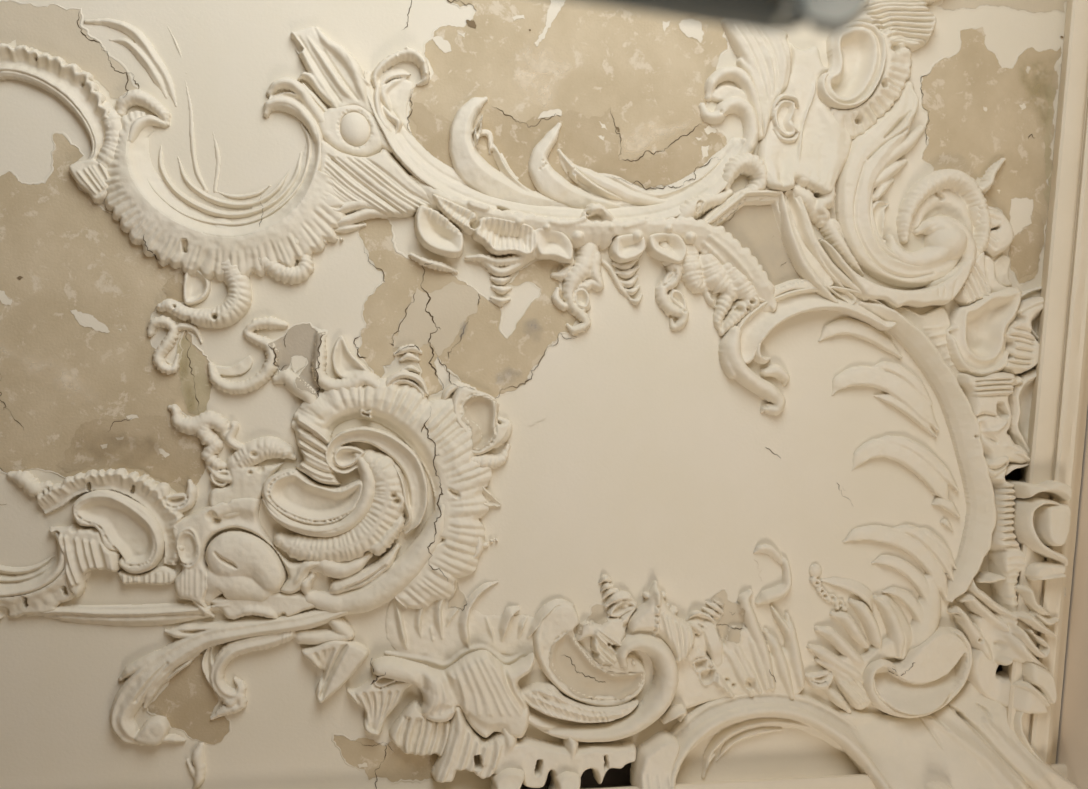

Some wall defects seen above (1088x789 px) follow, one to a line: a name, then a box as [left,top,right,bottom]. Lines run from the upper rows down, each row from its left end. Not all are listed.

peeling [407,0,730,192]
peeling [919,26,1063,286]
peeling [0,131,215,494]
peeling [354,218,579,451]
peeling [146,651,232,746]
peeling [331,733,438,789]